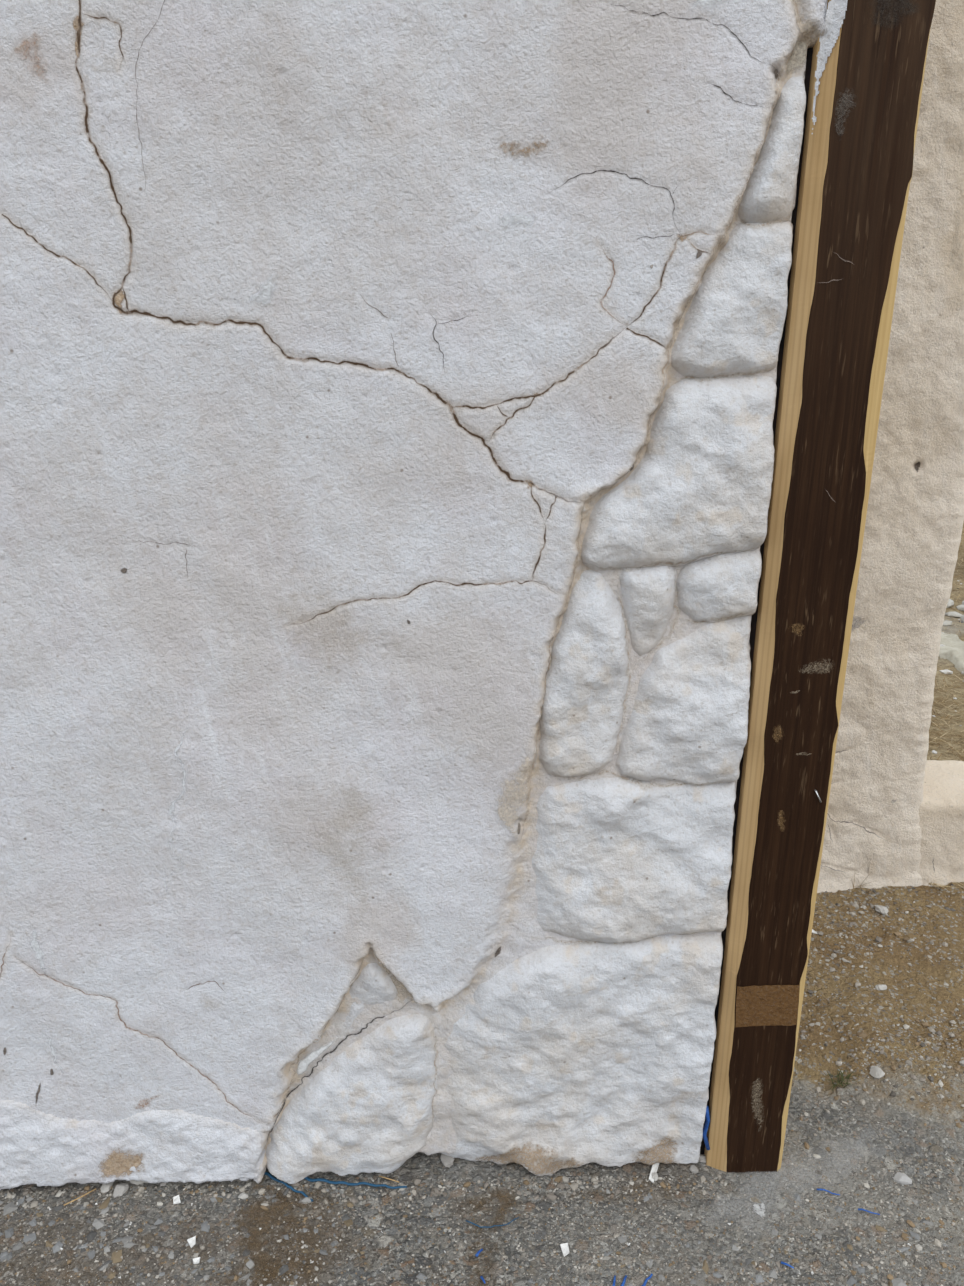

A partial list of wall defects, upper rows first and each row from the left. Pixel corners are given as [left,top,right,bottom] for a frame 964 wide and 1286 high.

crack [615,5,763,63]
crack [2,0,709,620]
crack [0,946,247,1115]